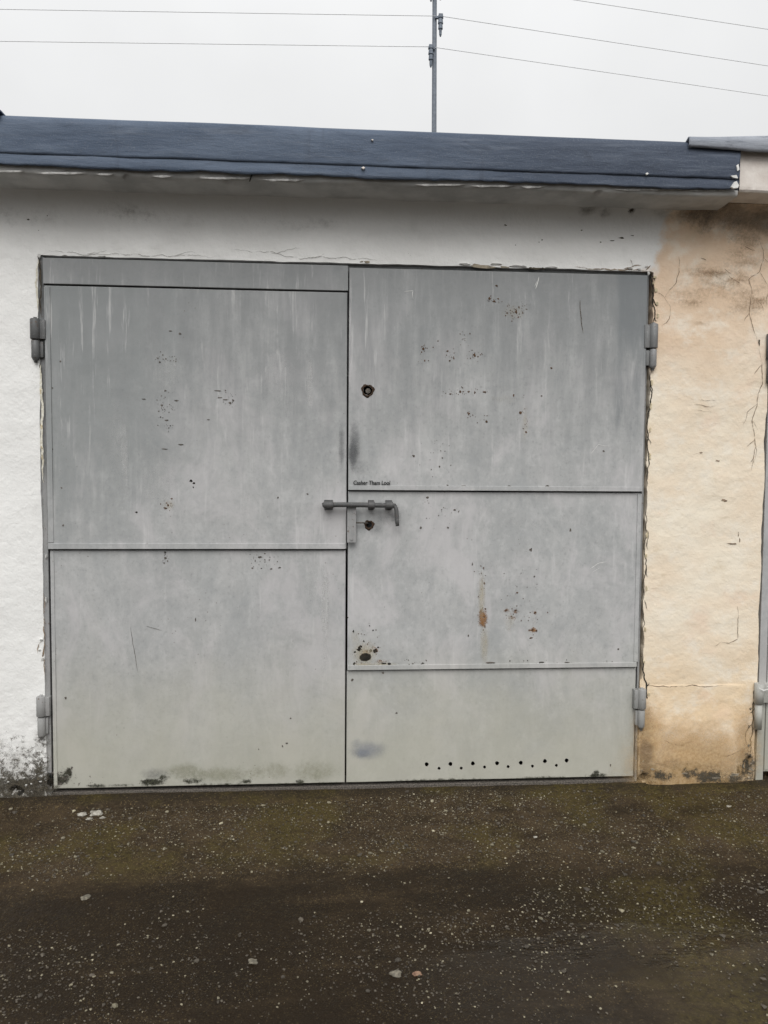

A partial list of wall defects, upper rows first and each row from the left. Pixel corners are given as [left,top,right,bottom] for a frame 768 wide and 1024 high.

crack [745,242,768,462]
rust [474,567,487,633]
damp [0,736,59,798]
damp [638,719,755,785]